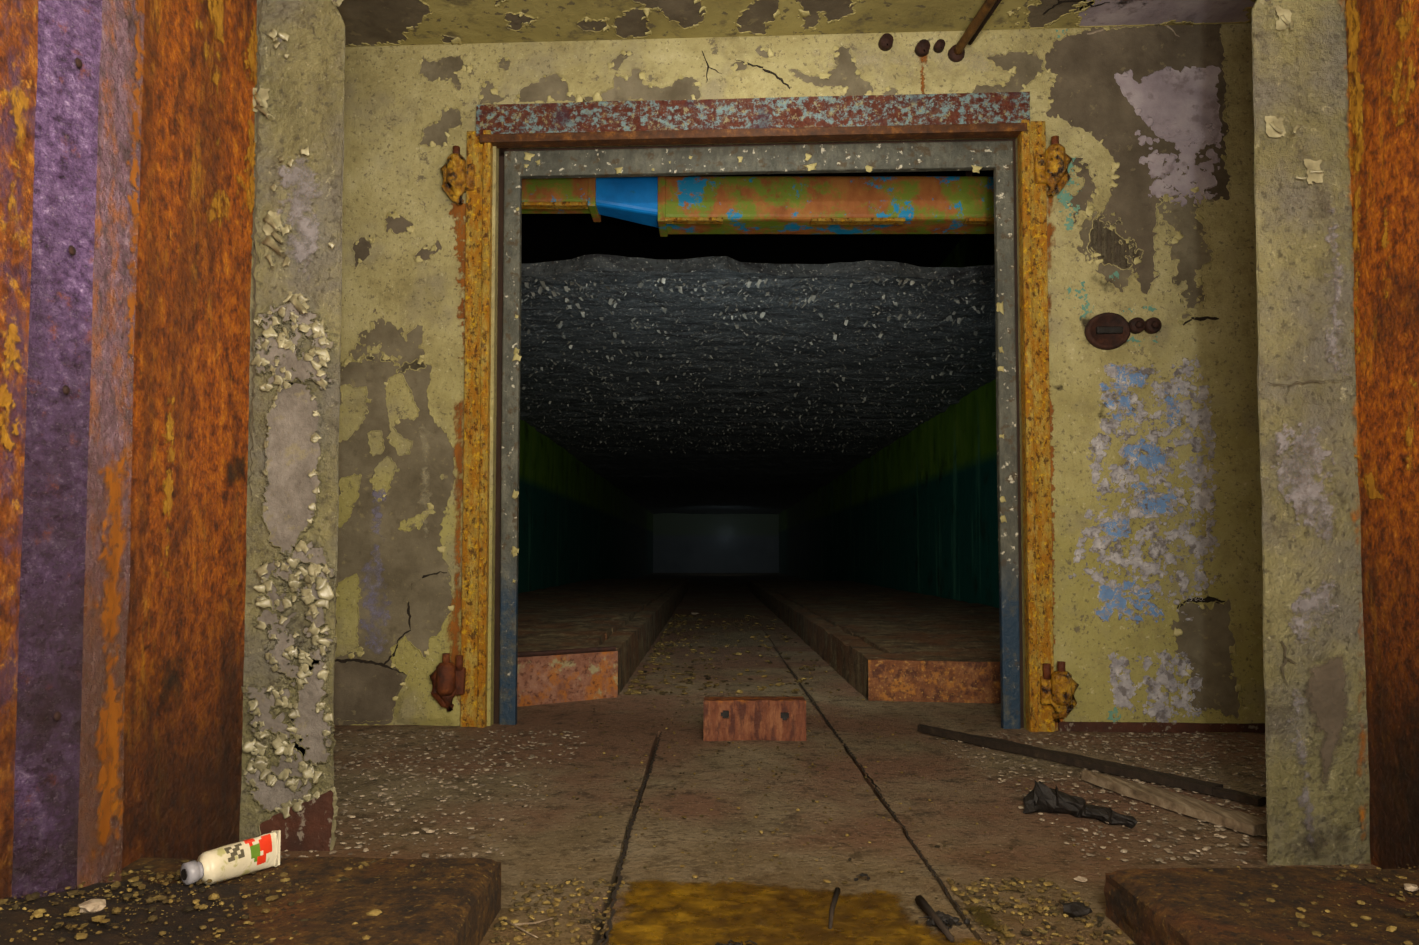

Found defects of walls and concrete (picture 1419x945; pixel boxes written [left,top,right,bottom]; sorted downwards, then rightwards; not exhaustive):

corrosion [0,323,26,457]
corrosion [90,449,131,857]
corrosion [125,0,146,360]
peeling [241,291,457,851]
peeling [262,147,443,278]
peeling [332,0,433,47]
corrosion [448,401,464,665]
corrosion [449,203,466,360]
peeling [937,355,1277,864]
peeling [971,0,1294,325]
peeling [1272,423,1335,539]
corrosion [1344,0,1364,251]